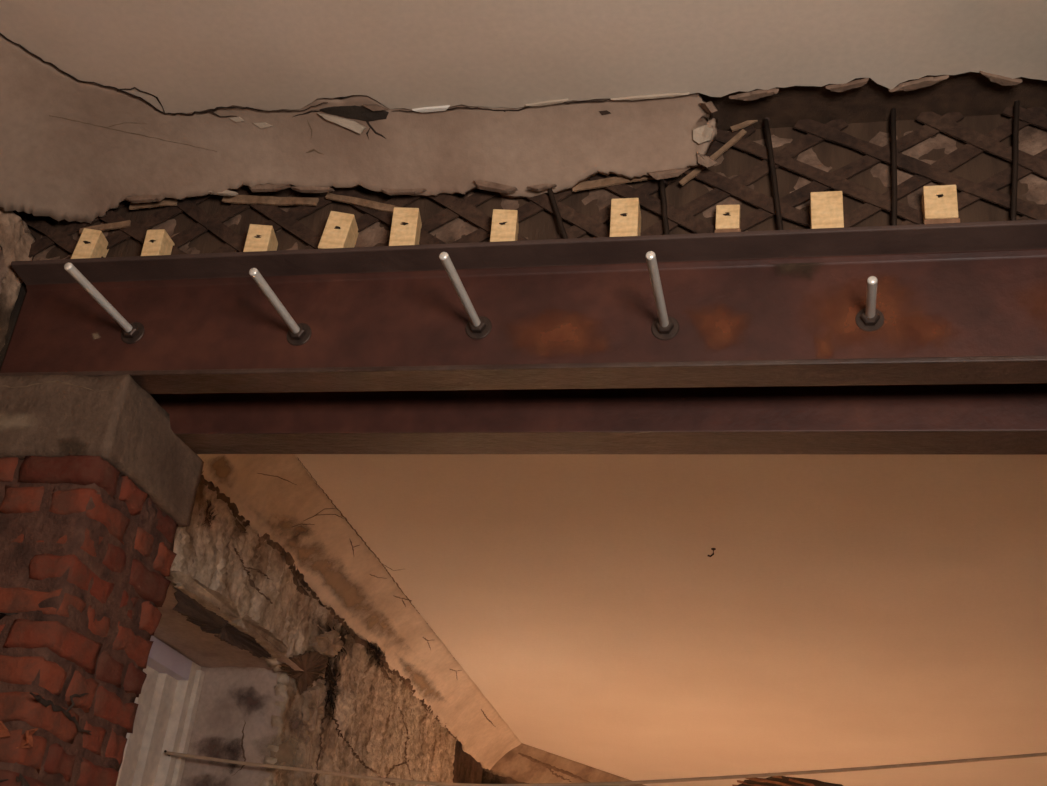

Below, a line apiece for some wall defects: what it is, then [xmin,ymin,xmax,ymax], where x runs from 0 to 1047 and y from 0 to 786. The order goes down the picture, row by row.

crack [0,33,328,152]
flaking render [293,104,389,139]
peeling [412,105,450,113]
crack [447,105,532,113]
crack [558,97,611,105]
flaking render [647,101,719,180]
flaking render [889,75,949,92]
leakage [278,520,392,667]
crack [258,457,462,678]
leakage [316,622,353,716]
crack [313,607,456,786]
flaking render [732,776,843,786]